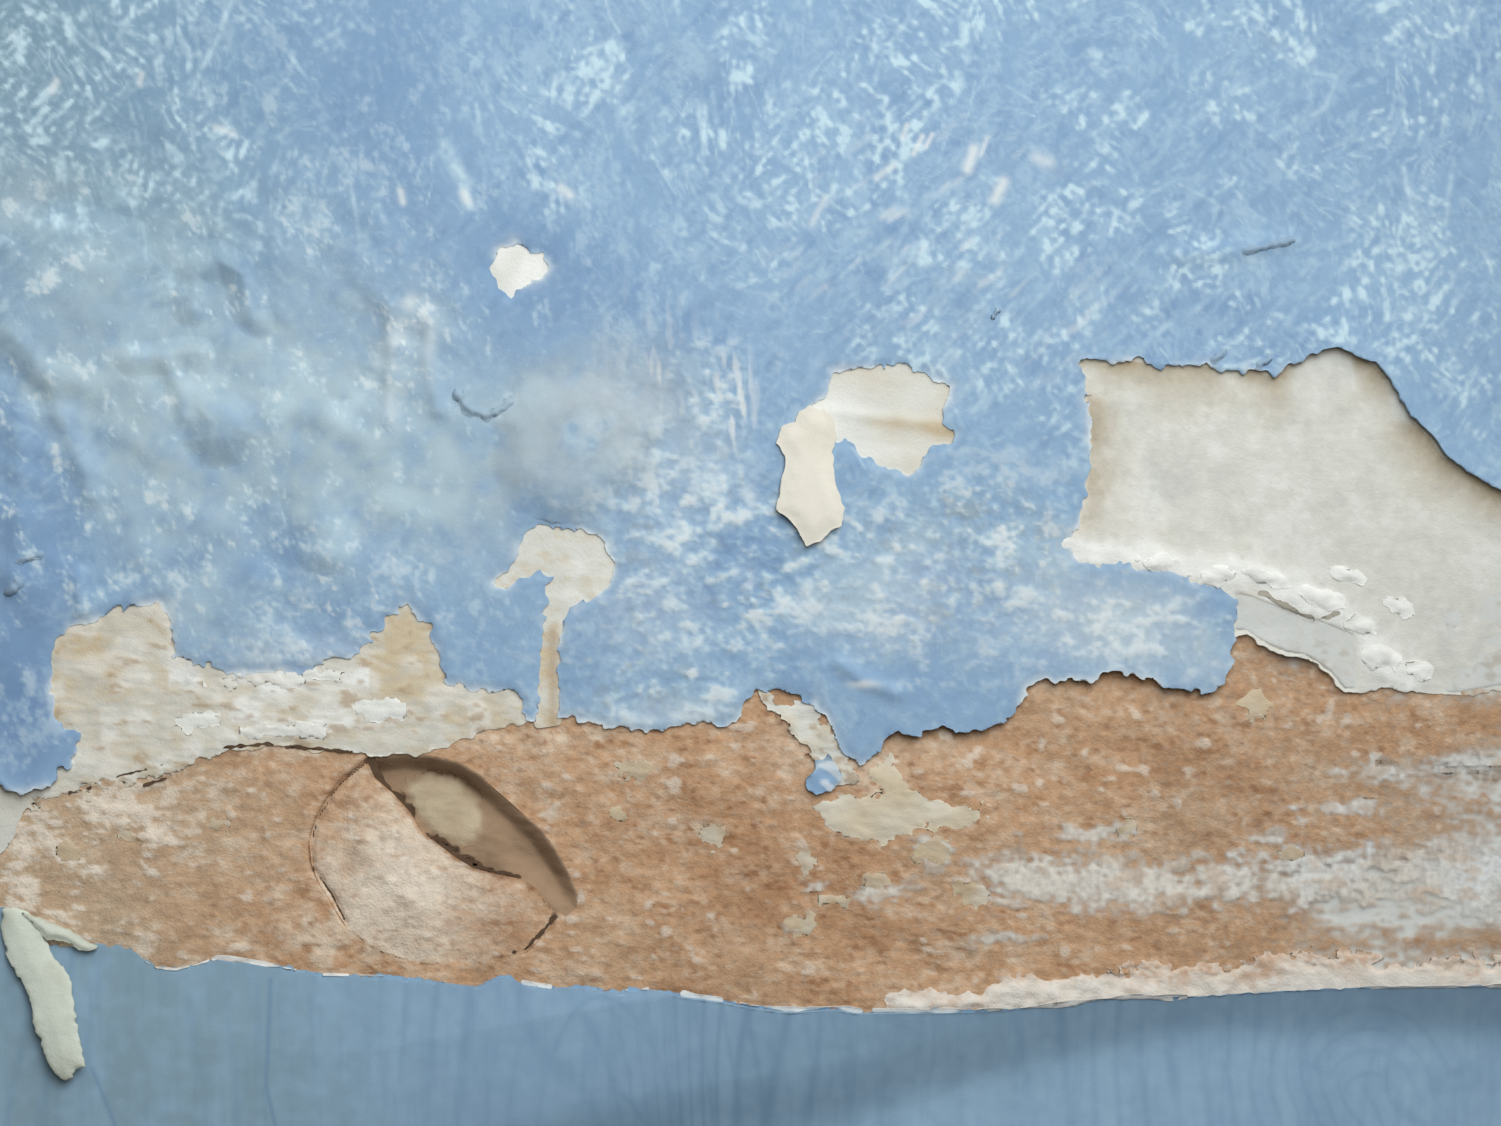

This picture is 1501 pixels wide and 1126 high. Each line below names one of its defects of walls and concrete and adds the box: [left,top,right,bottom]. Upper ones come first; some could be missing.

peeling [490,244,548,298]
spalling [0,347,1501,1012]
crack [68,764,166,795]
crack [223,741,521,920]
crack [512,914,557,954]